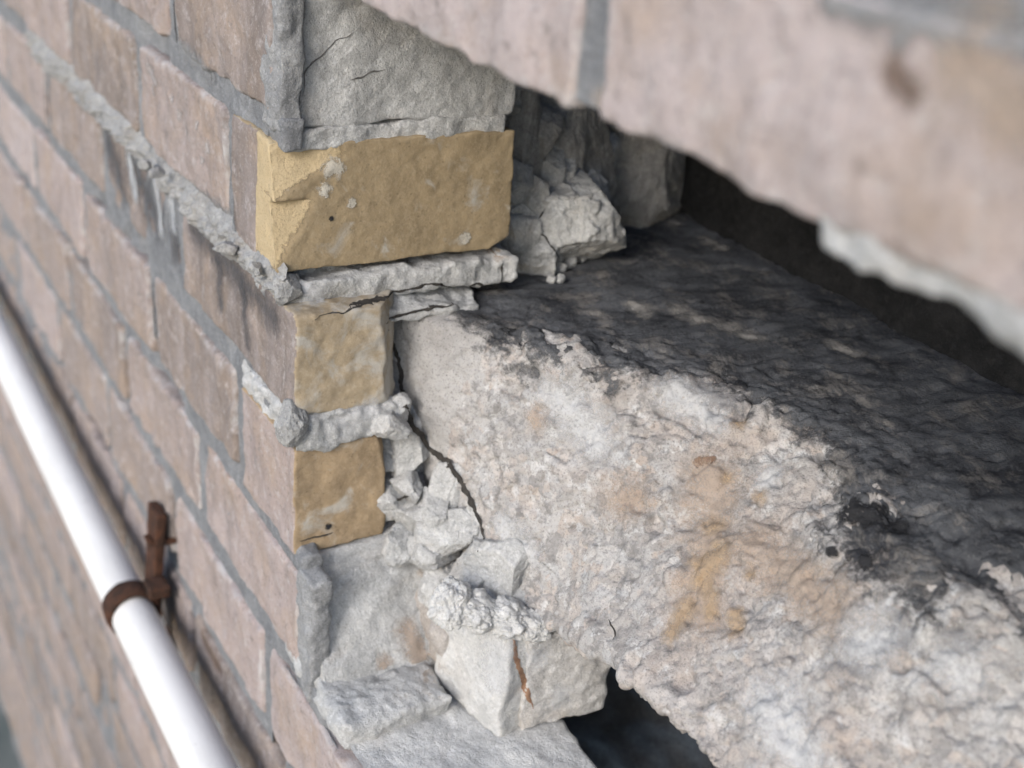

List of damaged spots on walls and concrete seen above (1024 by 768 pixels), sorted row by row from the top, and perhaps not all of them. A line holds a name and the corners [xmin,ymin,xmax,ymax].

crack [303,33,352,93]
crack [351,70,383,80]
crack [315,263,503,552]
spalling [415,329,1024,768]
leakage [454,211,1024,700]
leakage [746,684,822,768]